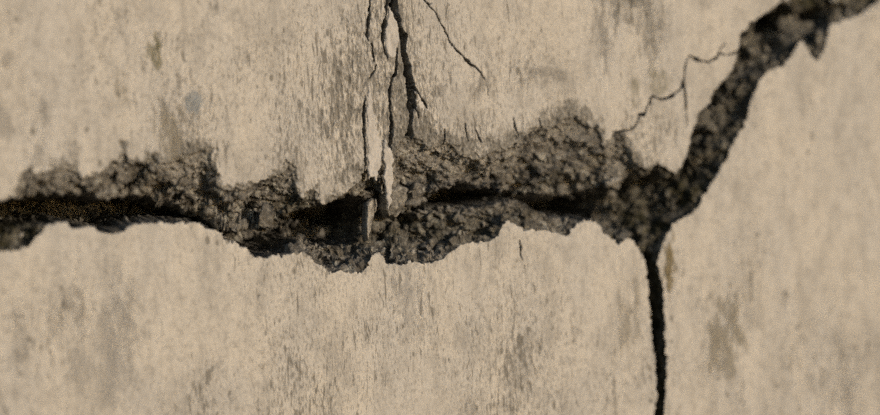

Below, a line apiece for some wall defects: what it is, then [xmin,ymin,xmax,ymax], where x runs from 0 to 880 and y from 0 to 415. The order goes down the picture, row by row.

crack [360,98,368,169]
spalling [0,212,57,252]
crack [0,184,378,259]
spalling [16,86,675,274]
crack [365,0,879,415]